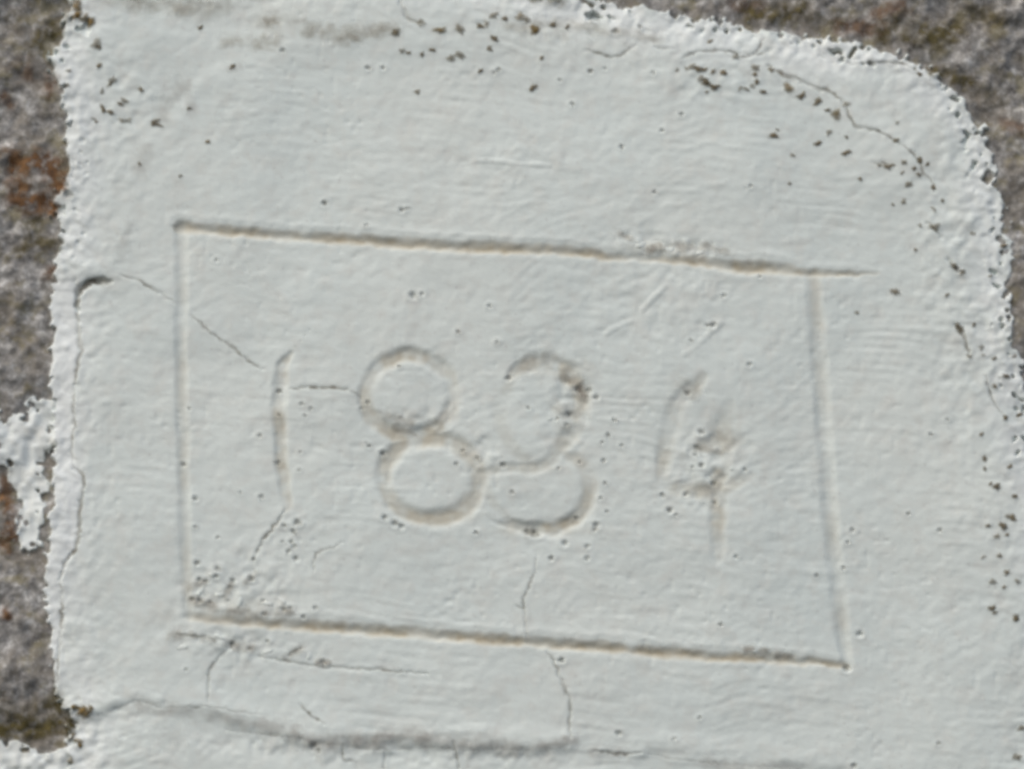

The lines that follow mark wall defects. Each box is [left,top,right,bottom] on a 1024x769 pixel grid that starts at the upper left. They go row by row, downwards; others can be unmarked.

crack [76,279,106,305]